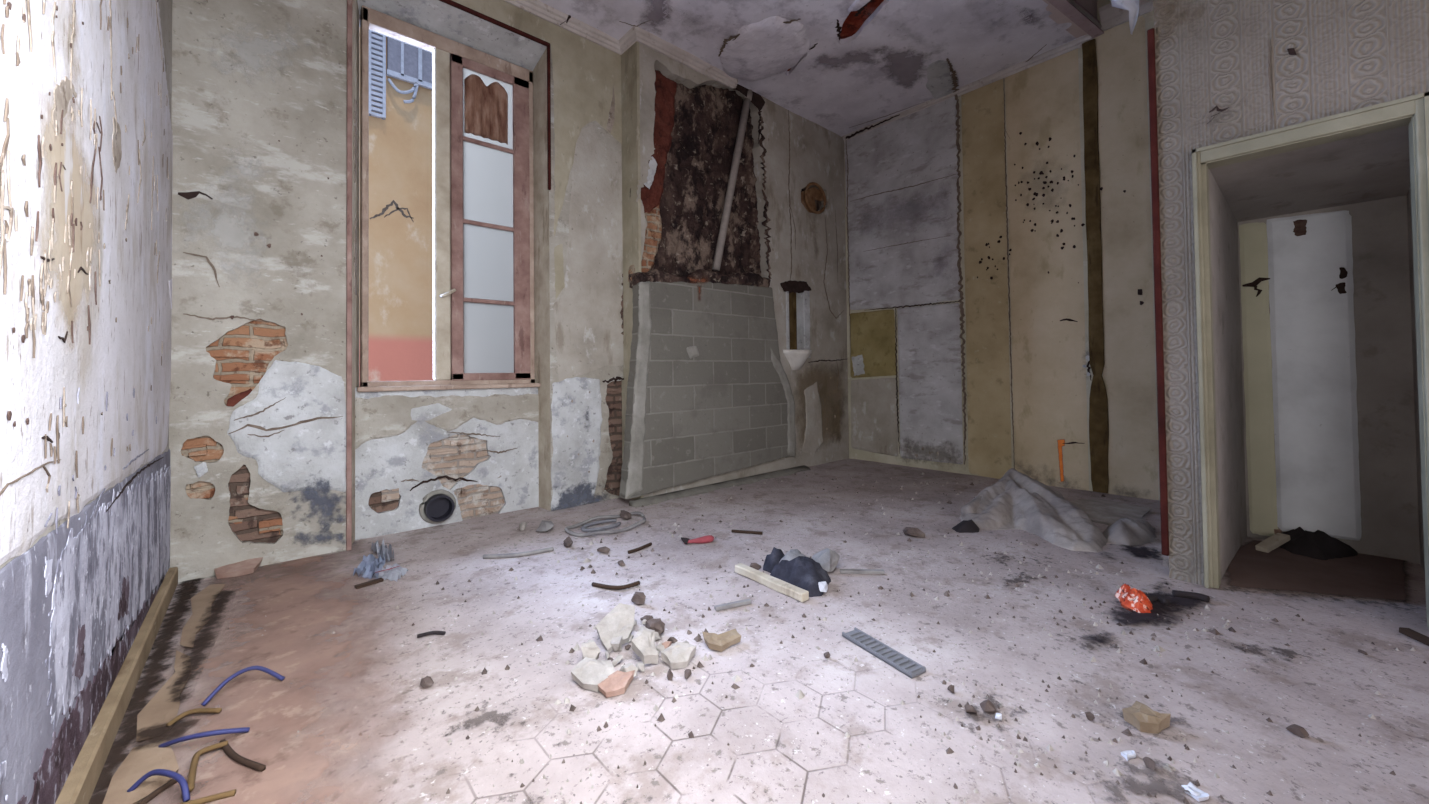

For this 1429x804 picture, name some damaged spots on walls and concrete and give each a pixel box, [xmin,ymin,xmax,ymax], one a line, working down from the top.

damp [44,105,96,324]
peeling [452,0,624,496]
flaking render [758,111,774,279]
peeling [0,0,288,731]
peeling [411,403,452,421]
crack [0,436,61,527]
crack [94,449,163,515]
flaking render [368,488,400,513]
flaking render [422,434,505,520]